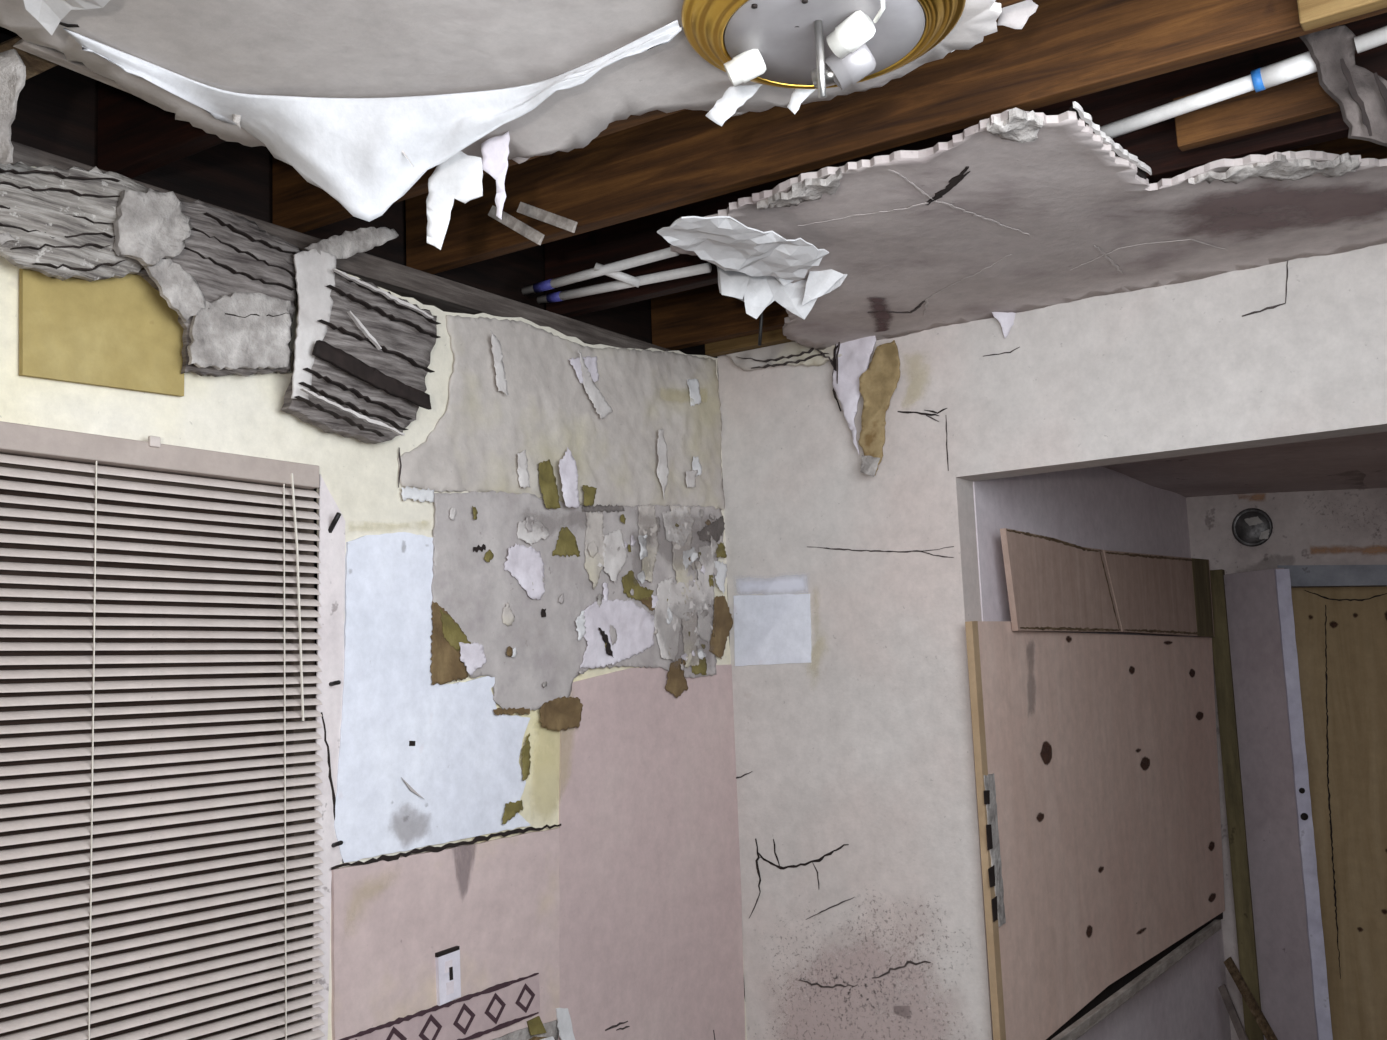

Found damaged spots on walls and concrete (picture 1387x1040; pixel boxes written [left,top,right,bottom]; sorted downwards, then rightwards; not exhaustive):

flaking render [986,107,1043,143]
flaking render [1188,153,1360,184]
flaking render [0,161,300,377]
peeling [401,486,434,503]
peeling [504,520,564,604]
peeling [575,506,812,674]
crack [749,839,854,920]
flaking render [493,1008,575,1040]
damp [792,952,931,1040]